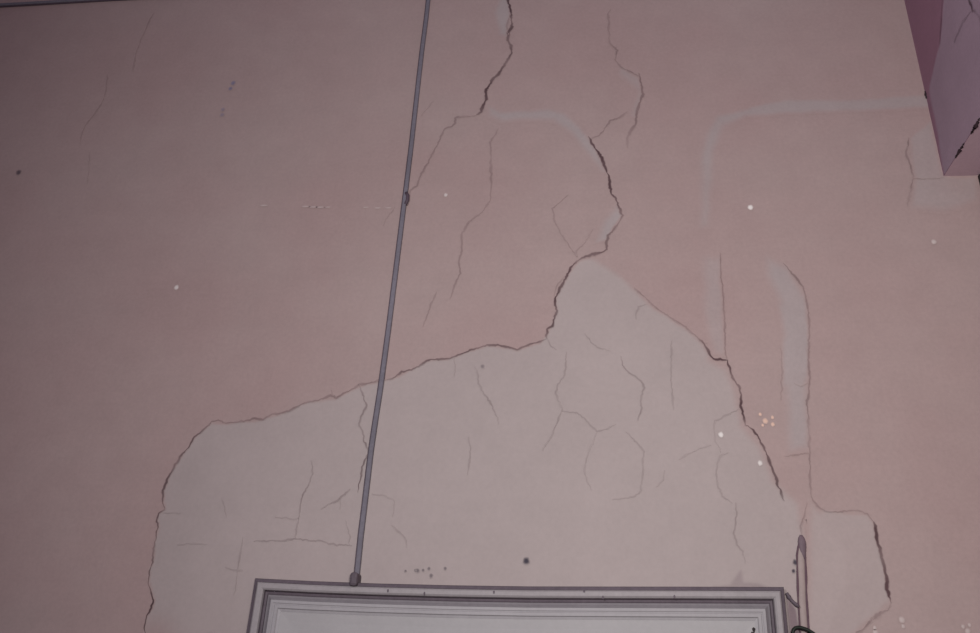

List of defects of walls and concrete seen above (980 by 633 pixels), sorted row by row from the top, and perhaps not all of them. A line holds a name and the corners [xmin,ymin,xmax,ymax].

crack [143,0,892,633]
crack [939,0,980,44]